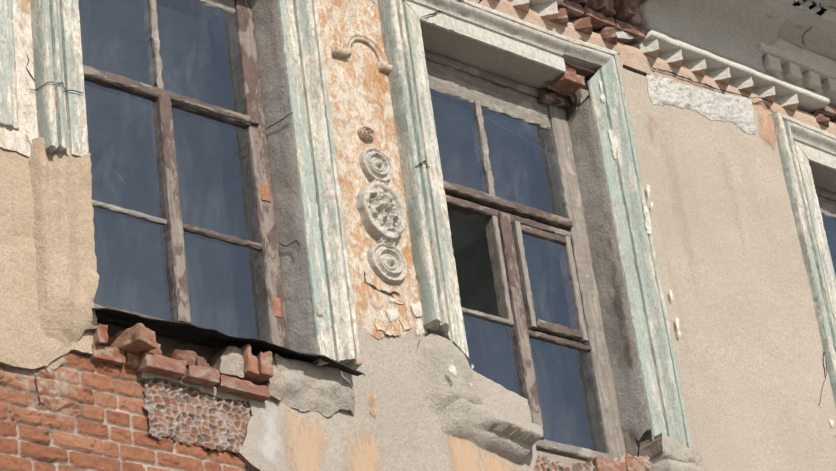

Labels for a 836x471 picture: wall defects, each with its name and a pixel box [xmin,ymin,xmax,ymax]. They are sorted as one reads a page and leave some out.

spalling [550,0,645,55]
spalling [794,0,821,14]
crack [26,55,84,94]
spalling [646,74,756,134]
crack [648,60,773,112]
spalling [812,104,836,132]
spalling [97,322,128,346]
spalling [155,335,220,366]
peeling [375,295,426,336]
spalling [0,352,251,471]